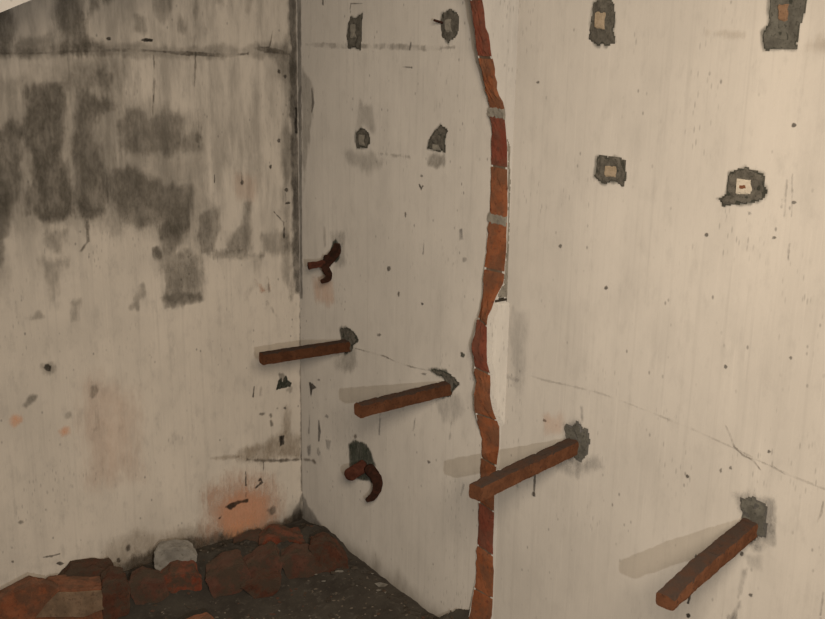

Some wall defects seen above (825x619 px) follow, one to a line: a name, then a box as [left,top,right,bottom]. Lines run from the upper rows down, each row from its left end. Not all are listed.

damp [27,85,71,221]
flaking render [461,0,511,478]
rust [259,339,351,365]
rust [354,381,452,418]
rust [469,438,579,501]
flaking render [469,496,494,619]
rust [656,518,758,611]